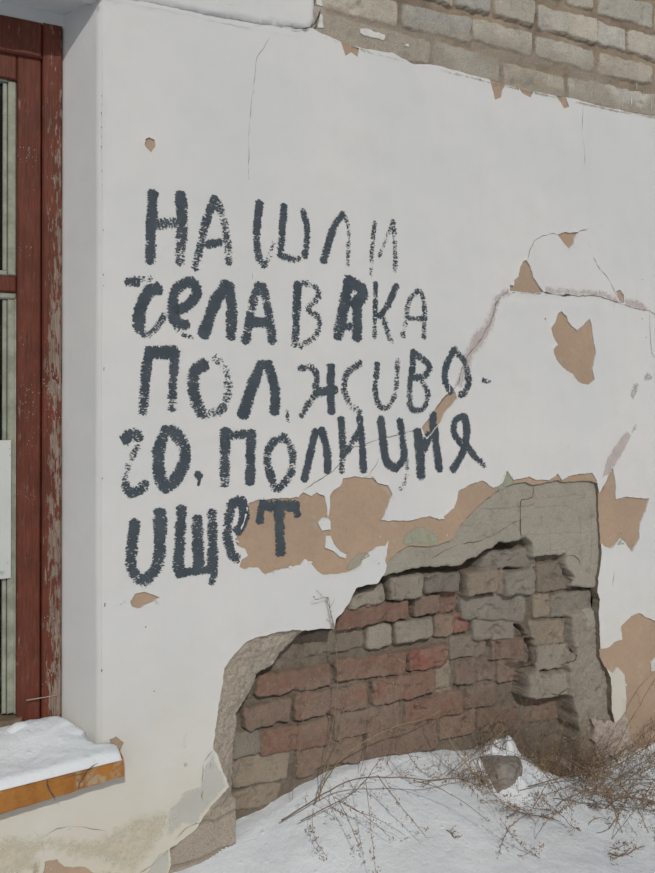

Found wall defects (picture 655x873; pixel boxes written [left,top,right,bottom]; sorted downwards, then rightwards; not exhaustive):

peeling [341,42,359,56]
peeling [490,80,505,100]
peeling [145,138,155,152]
peeling [545,312,595,385]
crack [309,258,654,487]
peeling [119,592,159,608]
flaking render [168,470,655,873]
peeling [43,859,93,873]